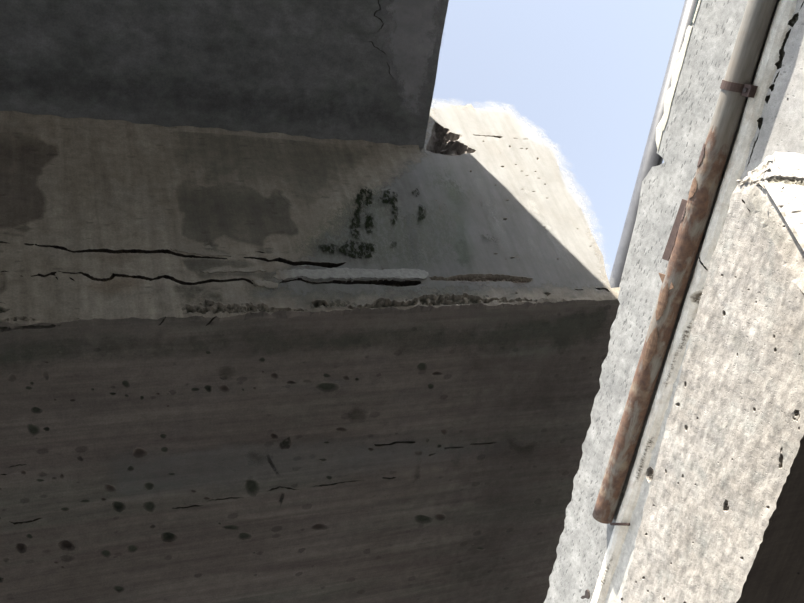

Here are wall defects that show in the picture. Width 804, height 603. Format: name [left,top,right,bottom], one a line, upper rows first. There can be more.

leakage [386,0,440,113]
leakage [259,100,606,307]
spalling [426,122,476,156]
peeling [656,0,701,151]
spalling [737,155,804,189]
crack [746,1,804,169]
spalling [0,307,90,332]
crack [0,241,421,287]